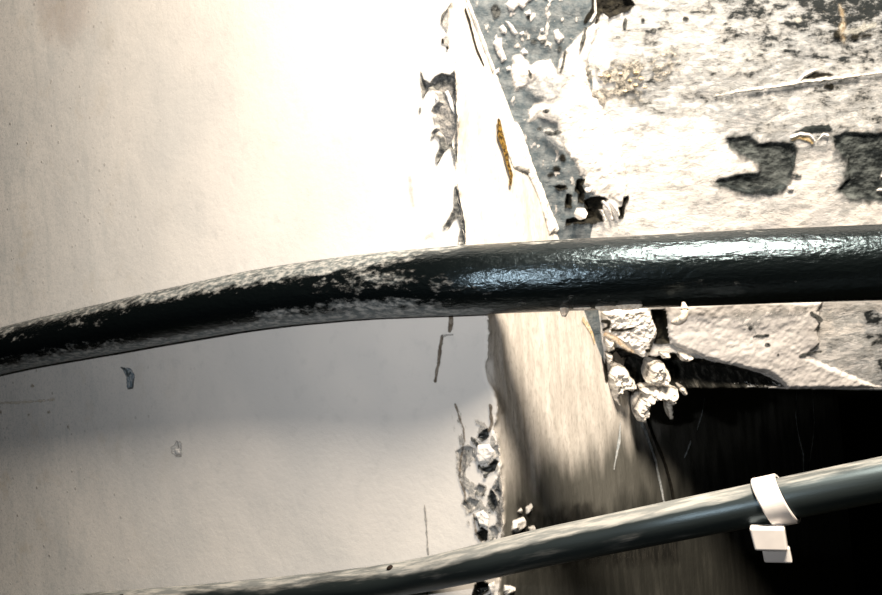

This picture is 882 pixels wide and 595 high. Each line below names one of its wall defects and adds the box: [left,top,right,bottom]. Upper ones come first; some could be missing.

spalling [441,3,452,50]
peeling [466,0,588,91]
spalling [586,52,676,105]
spalling [419,70,458,163]
spalling [443,184,466,245]
peeling [503,122,566,234]
peeling [714,135,801,195]
peeling [833,129,882,204]
spalling [455,404,536,542]